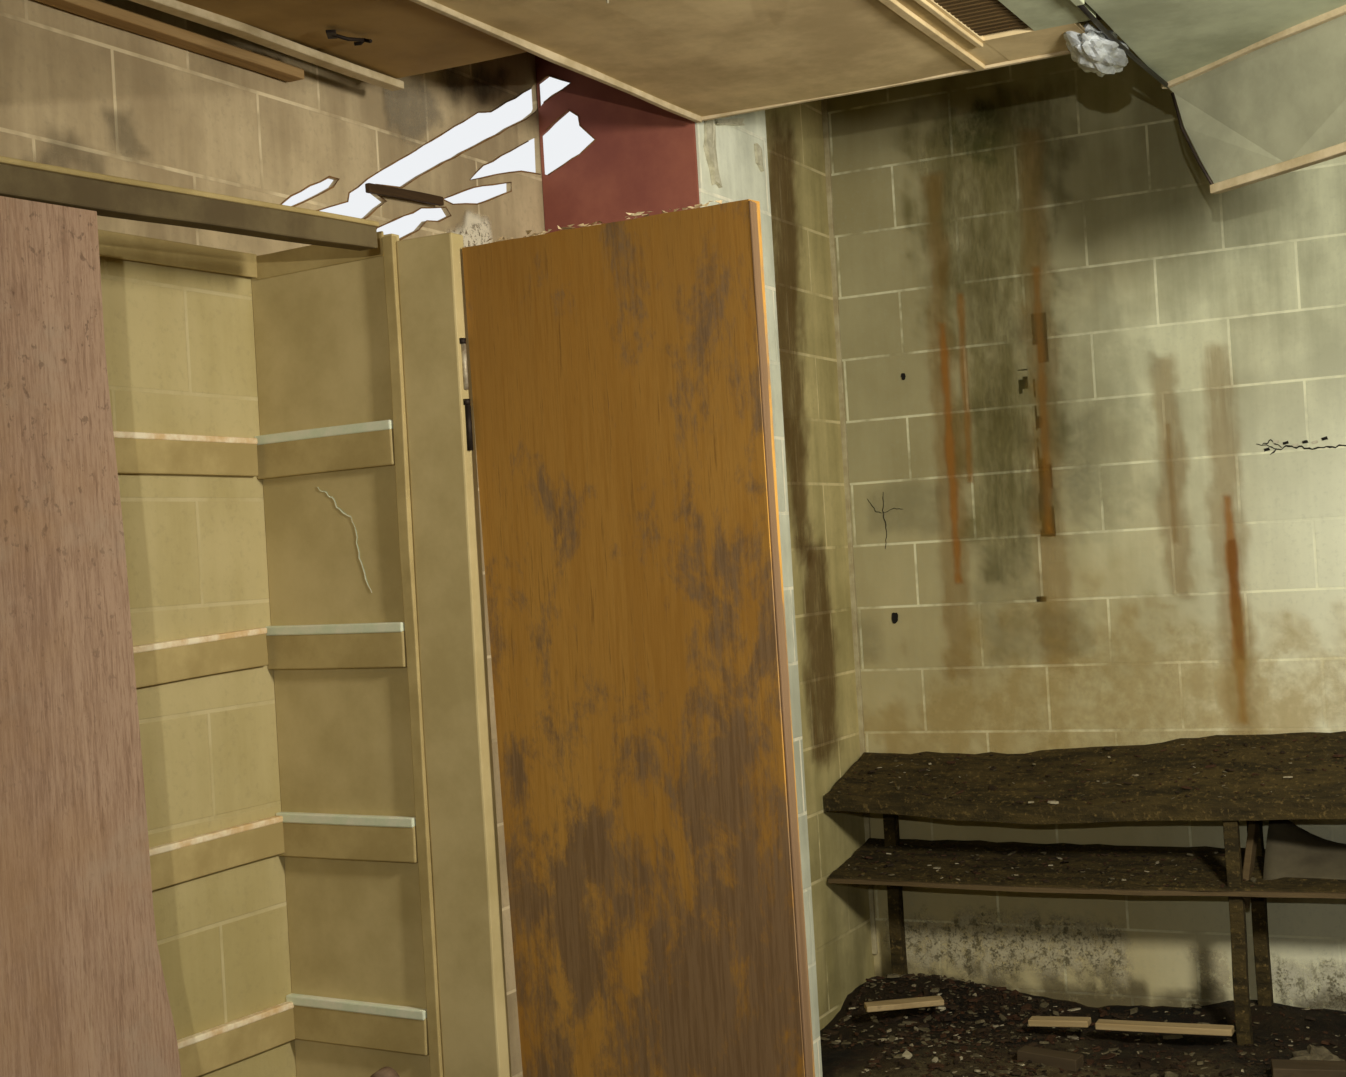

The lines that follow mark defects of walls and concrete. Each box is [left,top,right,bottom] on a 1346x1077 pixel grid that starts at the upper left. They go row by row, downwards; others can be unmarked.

corrosion [941,335,961,582]
corrosion [1226,498,1245,721]
damp [886,914,1147,1008]
damp [1271,962,1346,1011]